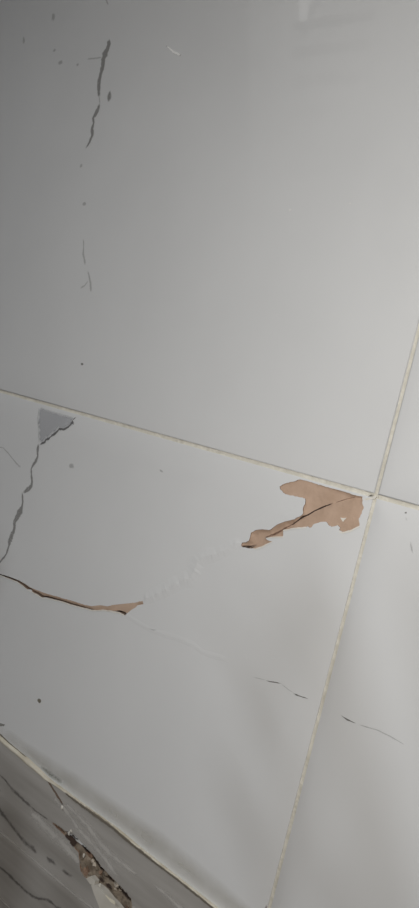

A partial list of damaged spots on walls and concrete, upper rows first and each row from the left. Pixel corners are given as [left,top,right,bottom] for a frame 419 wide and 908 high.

crack [0,446,242,616]
spalling [241,480,364,550]